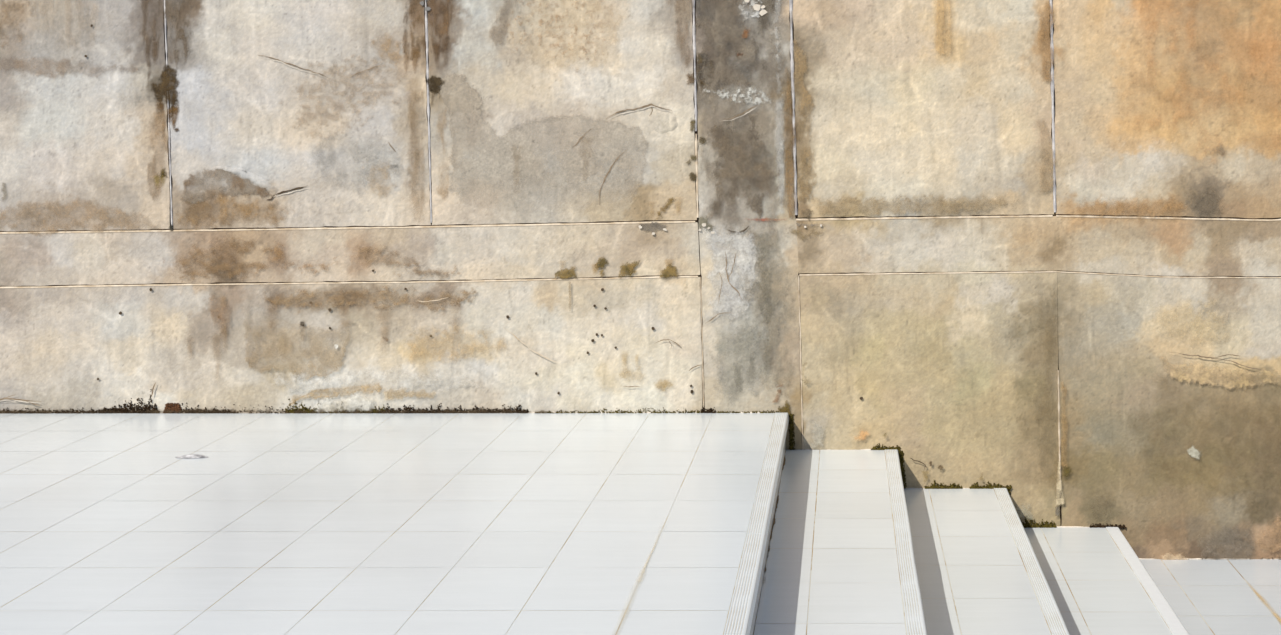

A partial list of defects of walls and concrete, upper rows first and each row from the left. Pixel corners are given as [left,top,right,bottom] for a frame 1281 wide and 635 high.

leakage [151,160,166,196]
leakage [180,169,283,279]
leakage [678,0,1006,394]
leakage [773,385,791,415]